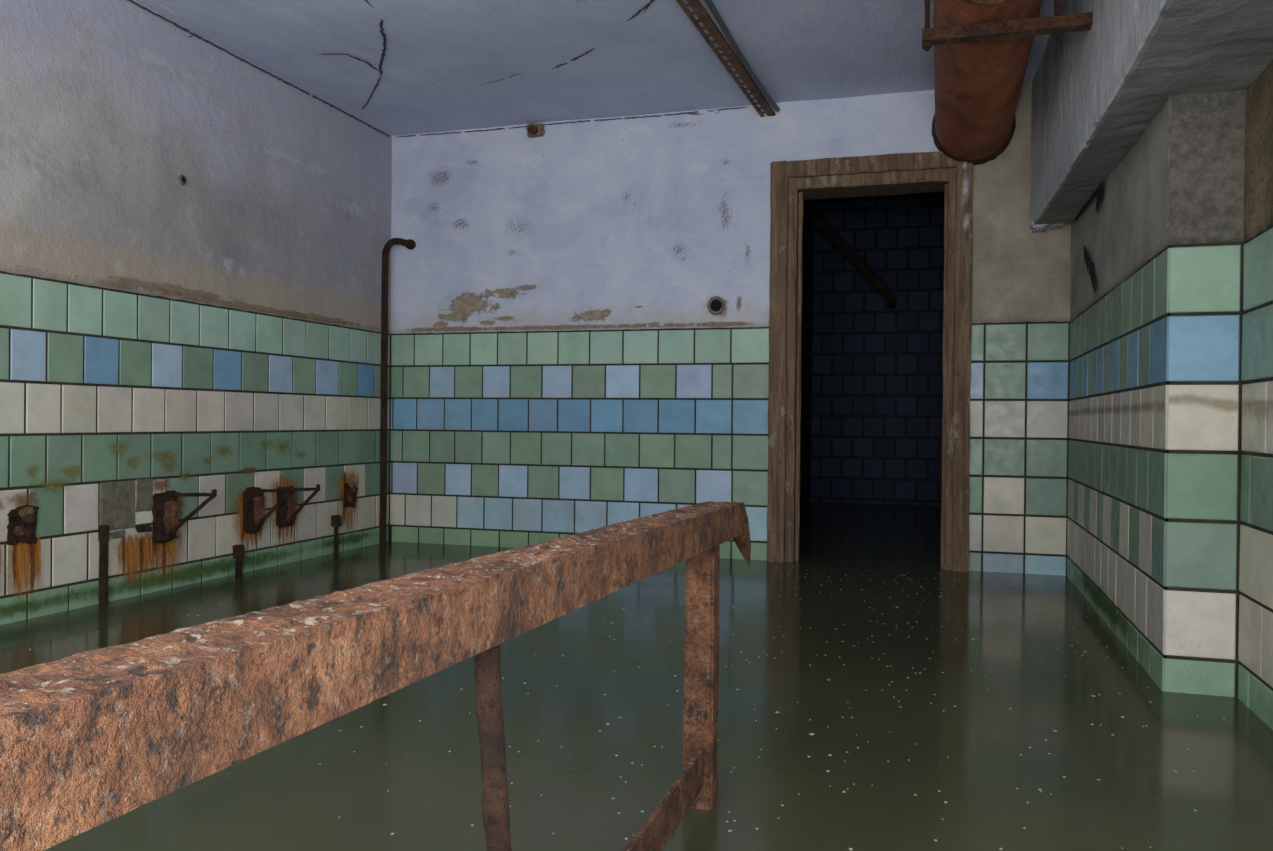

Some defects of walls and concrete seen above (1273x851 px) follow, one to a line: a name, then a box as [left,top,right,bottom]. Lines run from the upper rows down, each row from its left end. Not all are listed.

crack [129,0,745,137]
peeling [413,285,746,332]
rust [236,476,298,549]
rust [0,537,40,592]
rust [118,532,181,579]